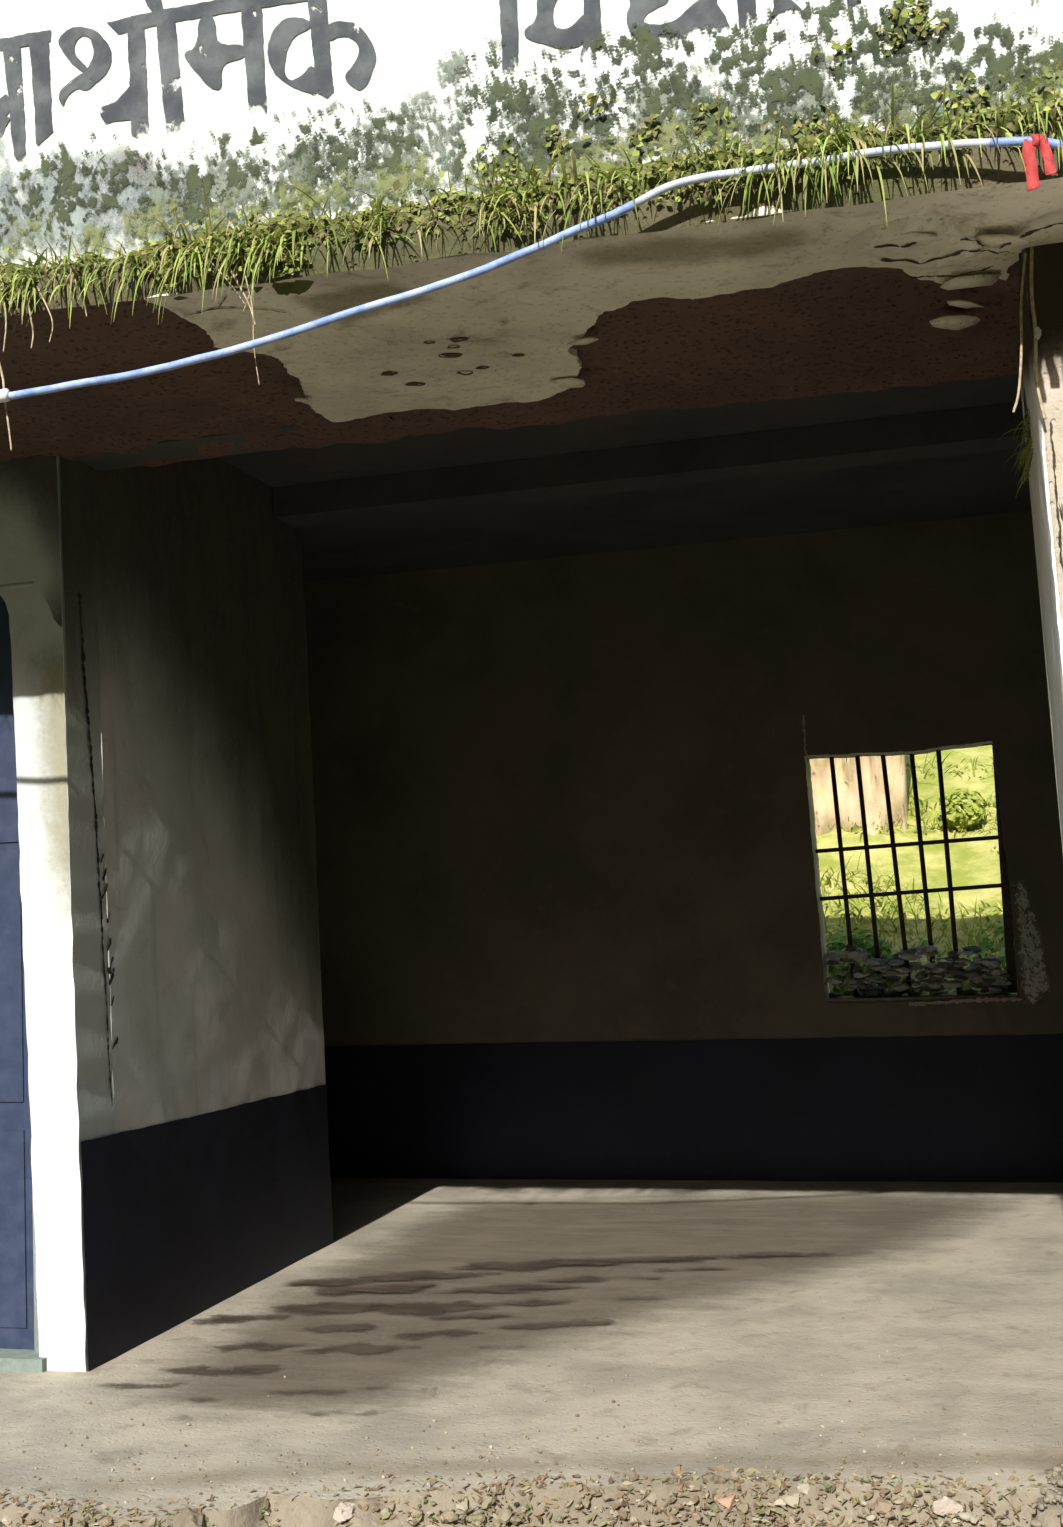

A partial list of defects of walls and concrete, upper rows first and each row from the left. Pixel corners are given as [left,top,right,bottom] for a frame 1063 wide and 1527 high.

damp [871,0,936,51]
damp [289,141,319,184]
damp [393,102,409,175]
damp [437,48,468,153]
spalling [0,217,1063,470]
peeling [1038,348,1063,620]